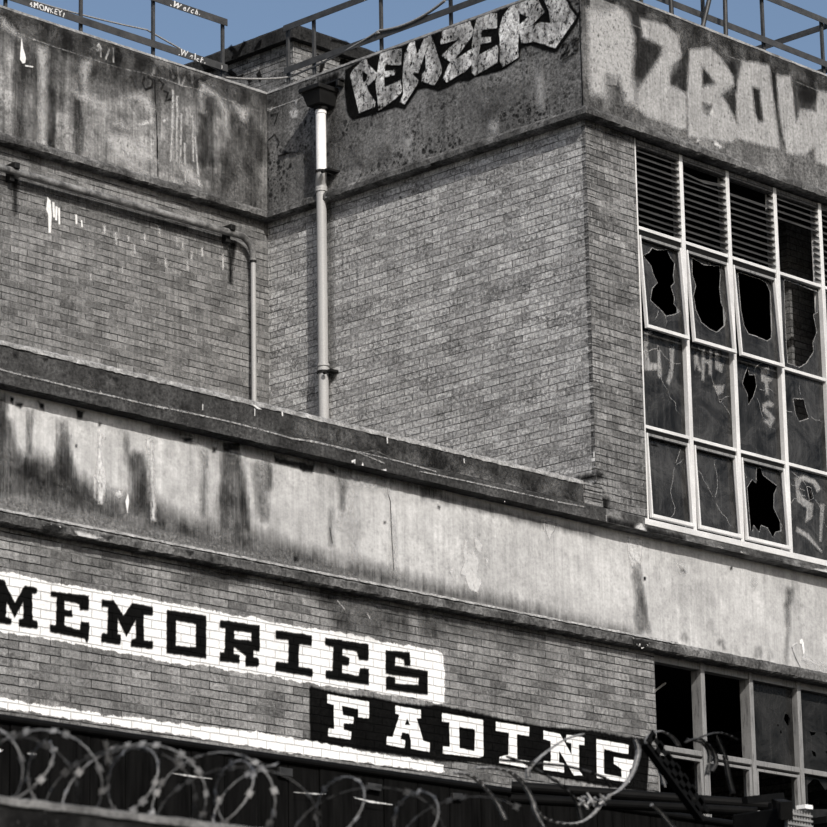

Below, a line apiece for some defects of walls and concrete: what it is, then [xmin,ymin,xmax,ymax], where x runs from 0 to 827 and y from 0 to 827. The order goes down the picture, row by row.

leakage [12,176,194,233]
leakage [3,15,263,208]
leakage [0,398,602,615]
peeling [450,539,488,592]